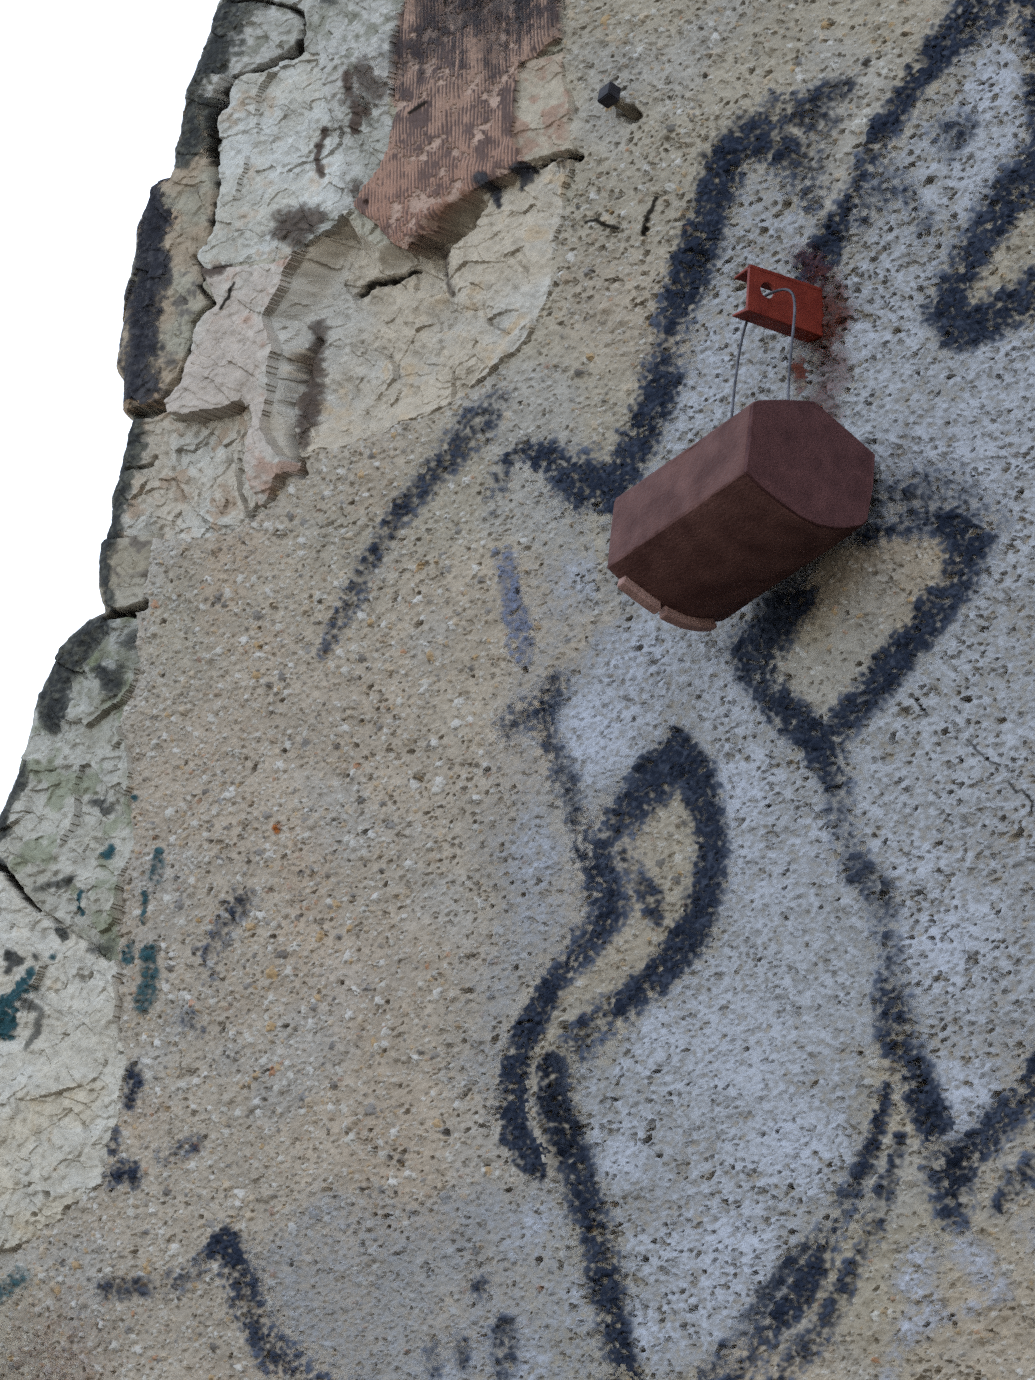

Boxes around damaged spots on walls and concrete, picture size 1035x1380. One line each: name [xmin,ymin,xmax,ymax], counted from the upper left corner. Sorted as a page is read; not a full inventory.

spalling [535,15,566,59]
crack [210,0,307,228]
crack [407,101,427,114]
crack [542,156,585,168]
crack [197,258,235,310]
spalling [112,51,585,542]
crack [360,270,420,298]
rust [818,289,852,343]
rust [791,355,813,392]
spalling [0,871,131,1250]